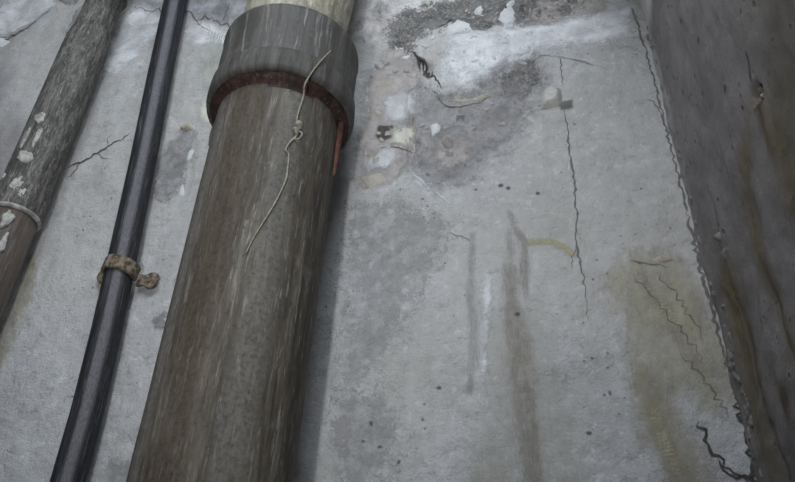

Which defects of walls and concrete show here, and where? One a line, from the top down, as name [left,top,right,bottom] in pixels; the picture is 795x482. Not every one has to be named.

crack [0,8,51,47]
peeling [358,0,636,208]
crack [533,55,609,85]
crack [564,111,589,320]
leakage [616,255,729,417]
crack [631,8,763,482]